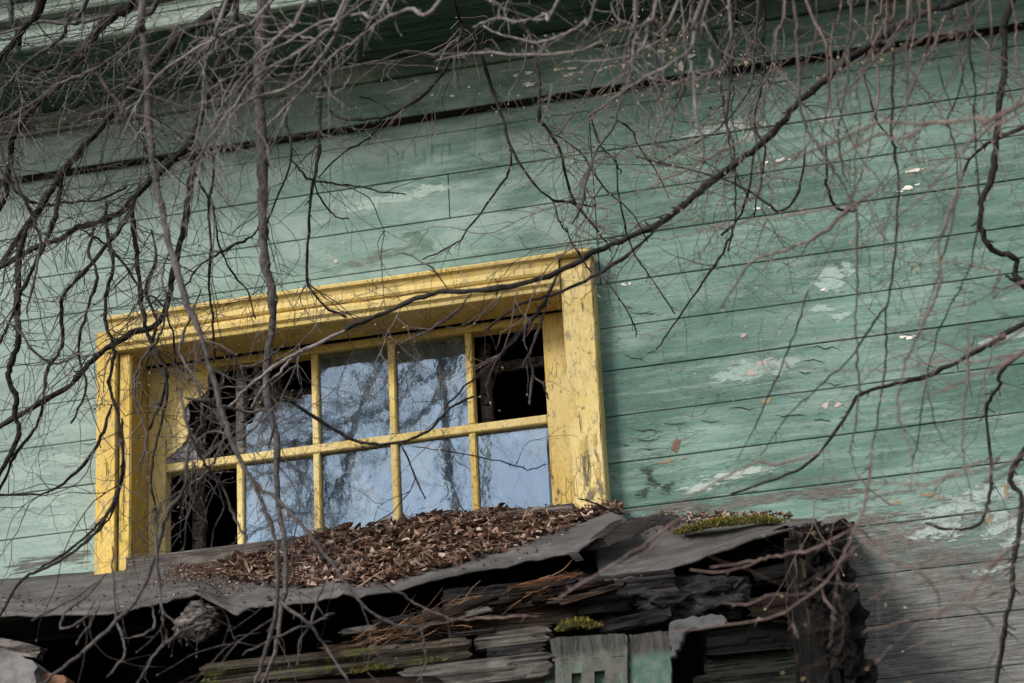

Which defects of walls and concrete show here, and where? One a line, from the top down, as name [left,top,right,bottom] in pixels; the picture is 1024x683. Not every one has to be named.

peeling [810,262,856,322]
peeling [712,357,802,384]
peeling [579,433,603,504]
peeling [625,466,876,517]
peeling [817,473,1024,575]